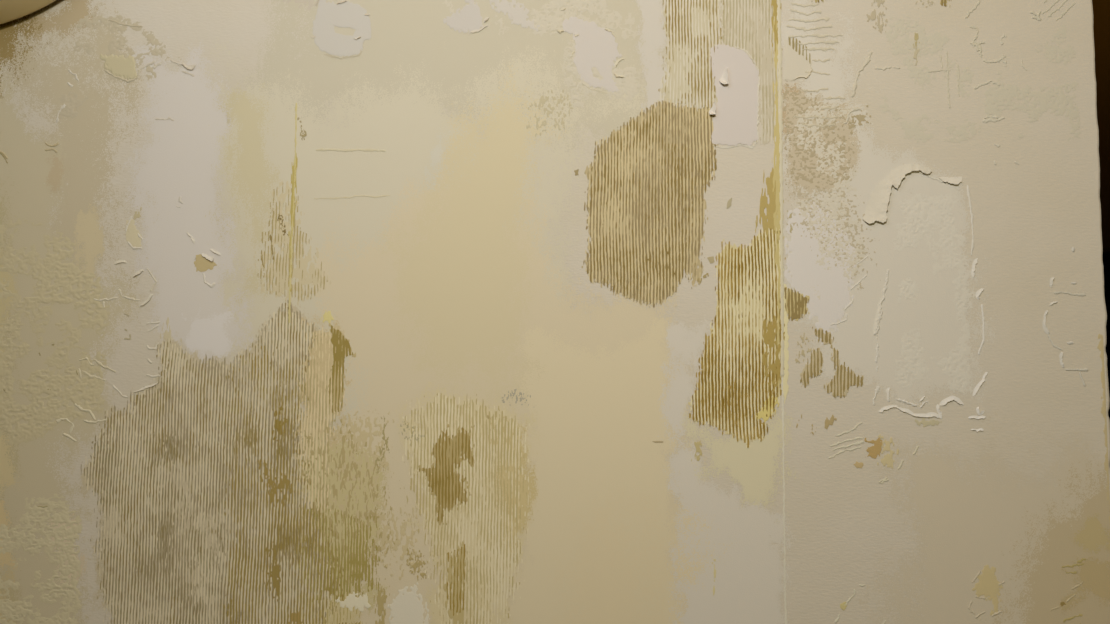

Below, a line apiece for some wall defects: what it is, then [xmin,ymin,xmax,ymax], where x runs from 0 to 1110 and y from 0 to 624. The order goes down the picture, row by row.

peeling [310,0,371,59]
peeling [709,44,760,149]
peeling [863,164,962,224]
peeling [186,232,221,272]
peeling [879,372,988,432]